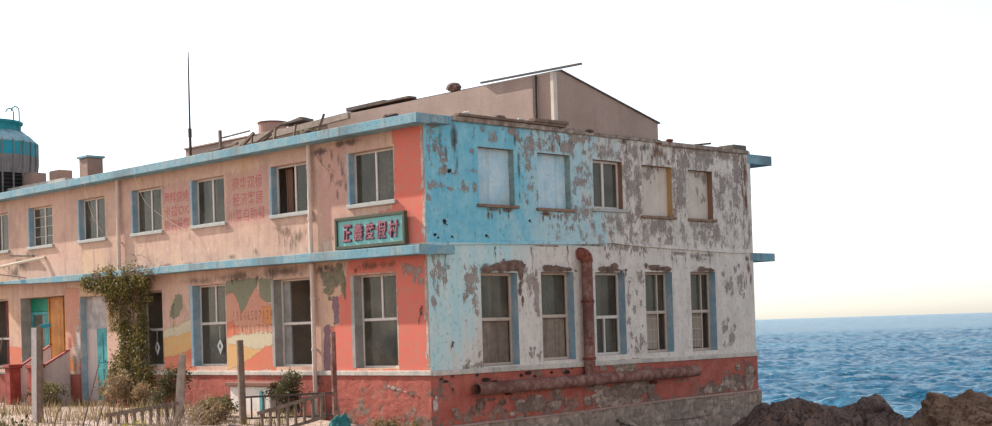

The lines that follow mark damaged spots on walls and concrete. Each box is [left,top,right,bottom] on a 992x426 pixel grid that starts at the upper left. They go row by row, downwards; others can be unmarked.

peeling [420,124,477,244]
peeling [320,262,346,301]
peeling [402,254,450,369]
flaking render [463,125,745,408]
flaking render [451,388,568,421]